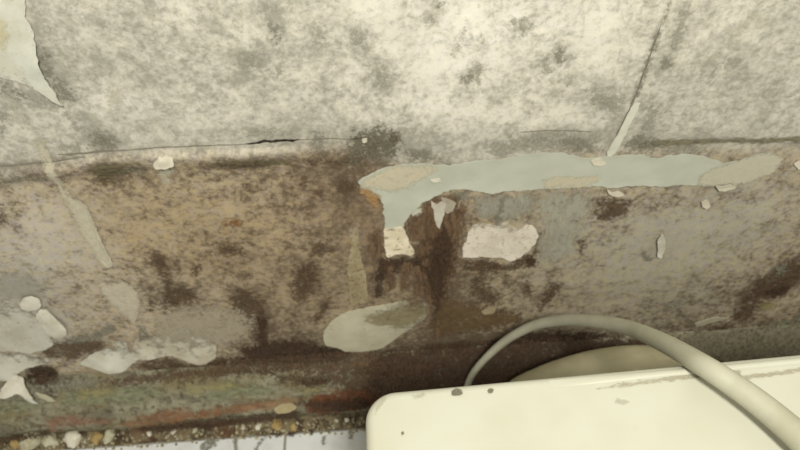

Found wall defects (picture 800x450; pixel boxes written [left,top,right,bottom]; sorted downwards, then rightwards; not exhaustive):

peeling [0,0,63,106]
crack [616,2,692,136]
water stain [89,163,147,187]
crack [0,137,372,167]
water stain [207,158,293,170]
water stain [308,125,438,196]
peeling [358,152,783,261]
peeling [0,273,67,404]
peeling [96,280,141,322]
peeling [80,306,256,374]
water stain [0,190,646,450]
water stain [679,257,800,362]